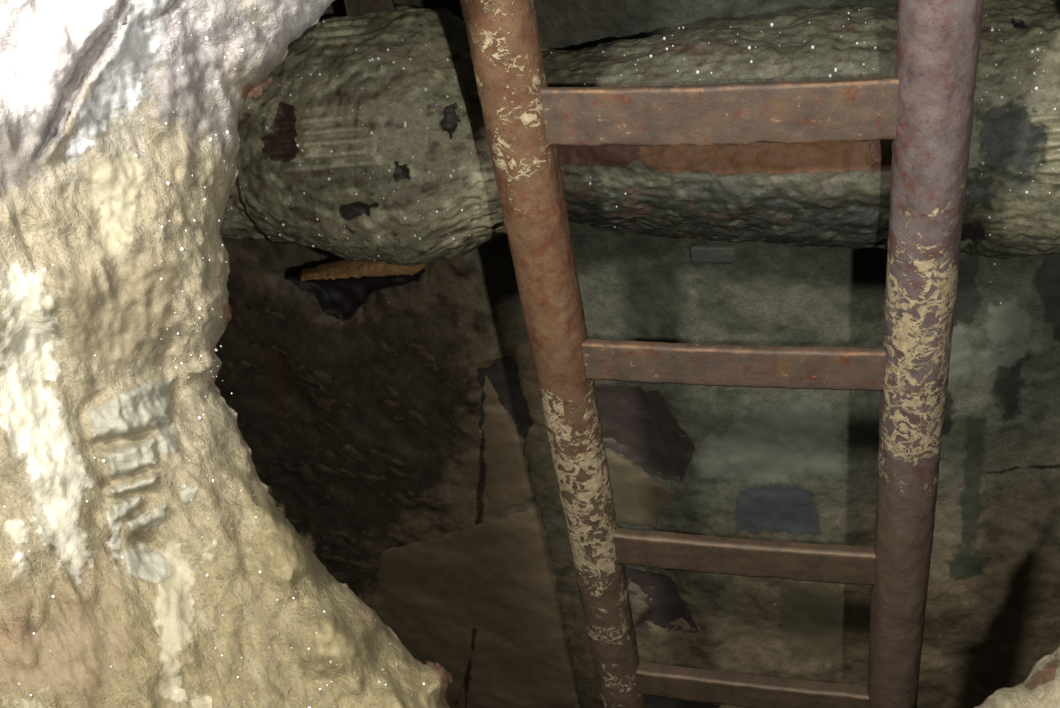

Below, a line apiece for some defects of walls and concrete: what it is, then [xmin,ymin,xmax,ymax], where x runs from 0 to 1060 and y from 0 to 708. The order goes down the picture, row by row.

spalling [262,102,300,163]
spalling [281,268,425,321]
damp [0,263,92,583]
damp [107,511,121,559]
crack [475,424,486,525]
spalling [595,385,694,483]
damp [694,396,843,535]
damp [950,417,990,579]
crack [987,464,1060,473]
crack [454,628,477,708]